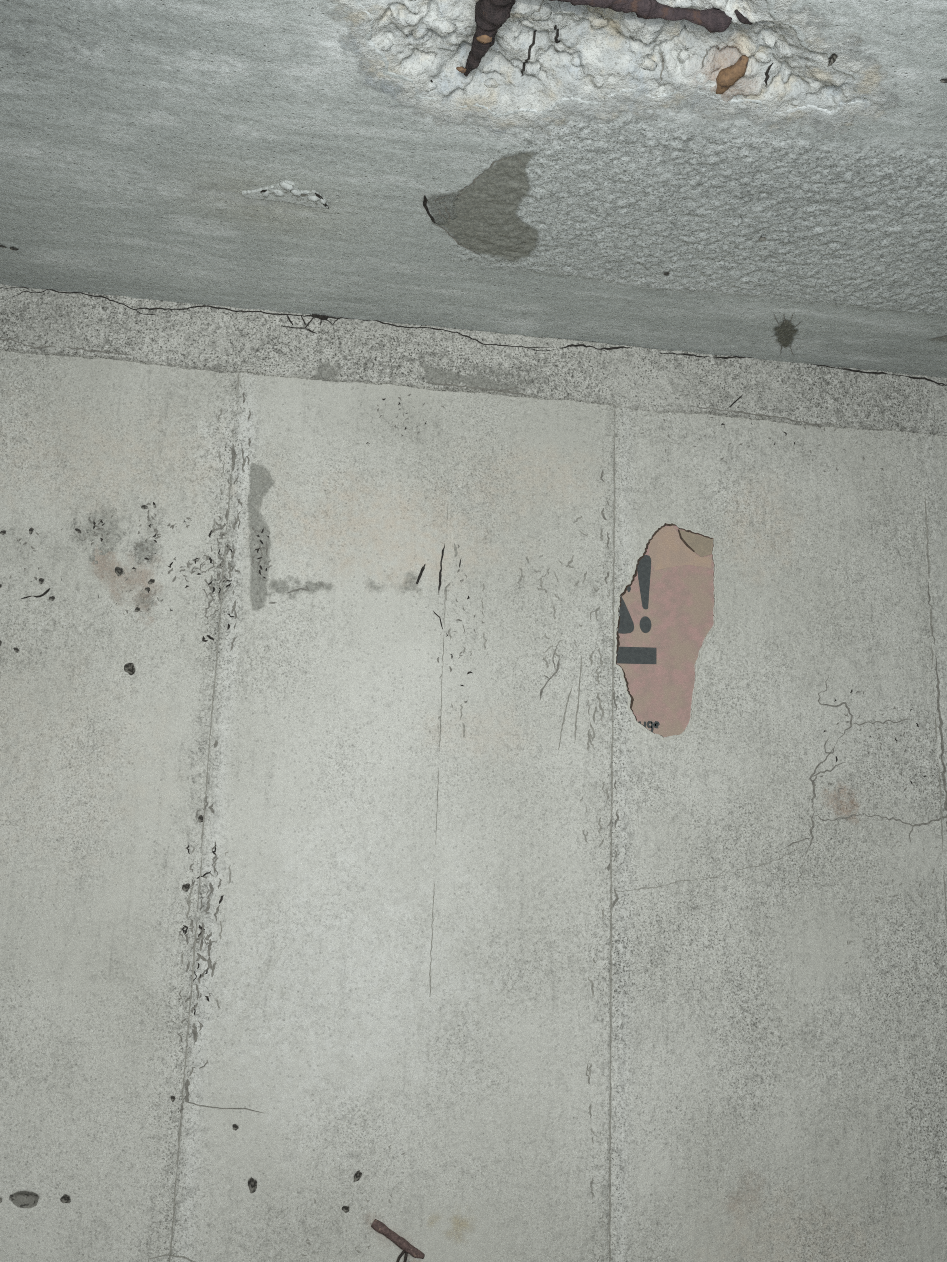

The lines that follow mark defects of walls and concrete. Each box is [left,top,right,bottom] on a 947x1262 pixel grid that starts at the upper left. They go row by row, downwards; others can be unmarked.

rust [456,0,516,77]
spalling [317,0,899,139]
rust [549,0,732,33]
leakage [423,152,538,261]
leakage [248,464,332,610]
peeling [614,521,718,741]
crack [622,582,947,892]